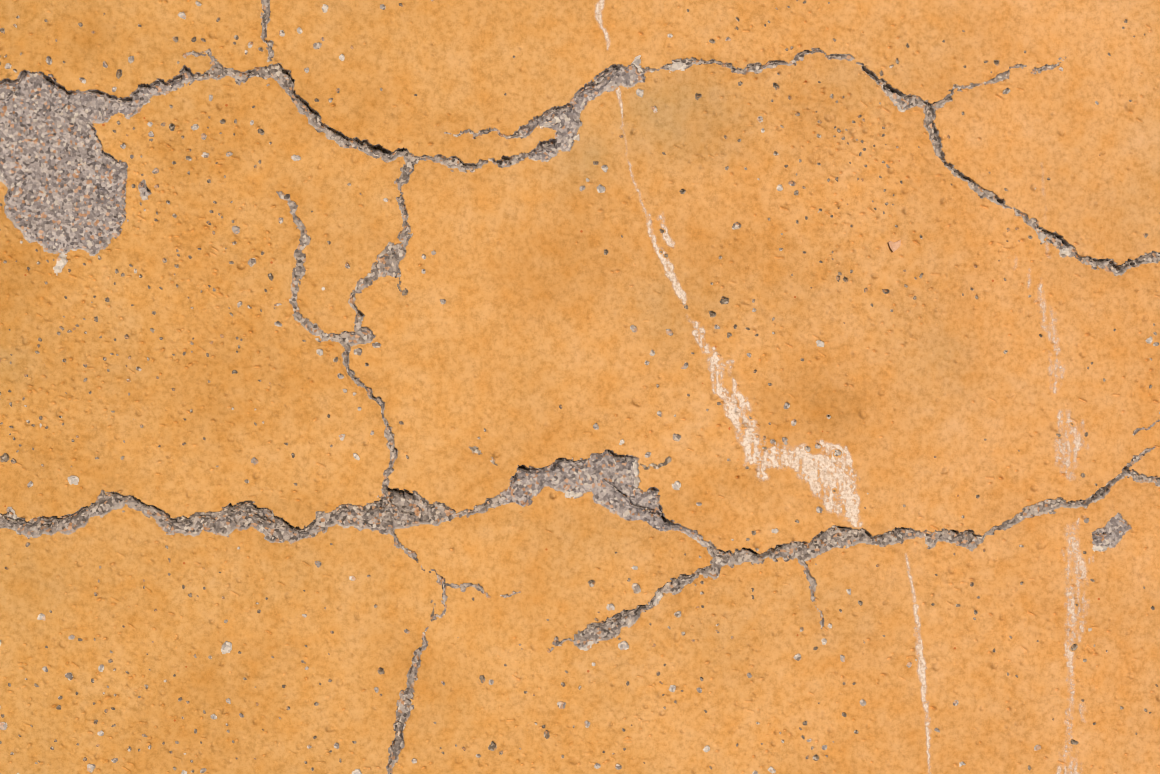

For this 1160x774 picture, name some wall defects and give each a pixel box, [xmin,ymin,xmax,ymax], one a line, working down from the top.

spalling [35,248,216,396]
flaking render [0,39,273,292]
crack [0,0,531,774]
flaking render [499,439,710,558]
leakage [629,163,686,305]
leakage [692,321,862,527]
crack [547,412,1160,653]
crack [642,48,1160,276]
leakage [1057,412,1083,478]
flaking render [1083,512,1132,554]